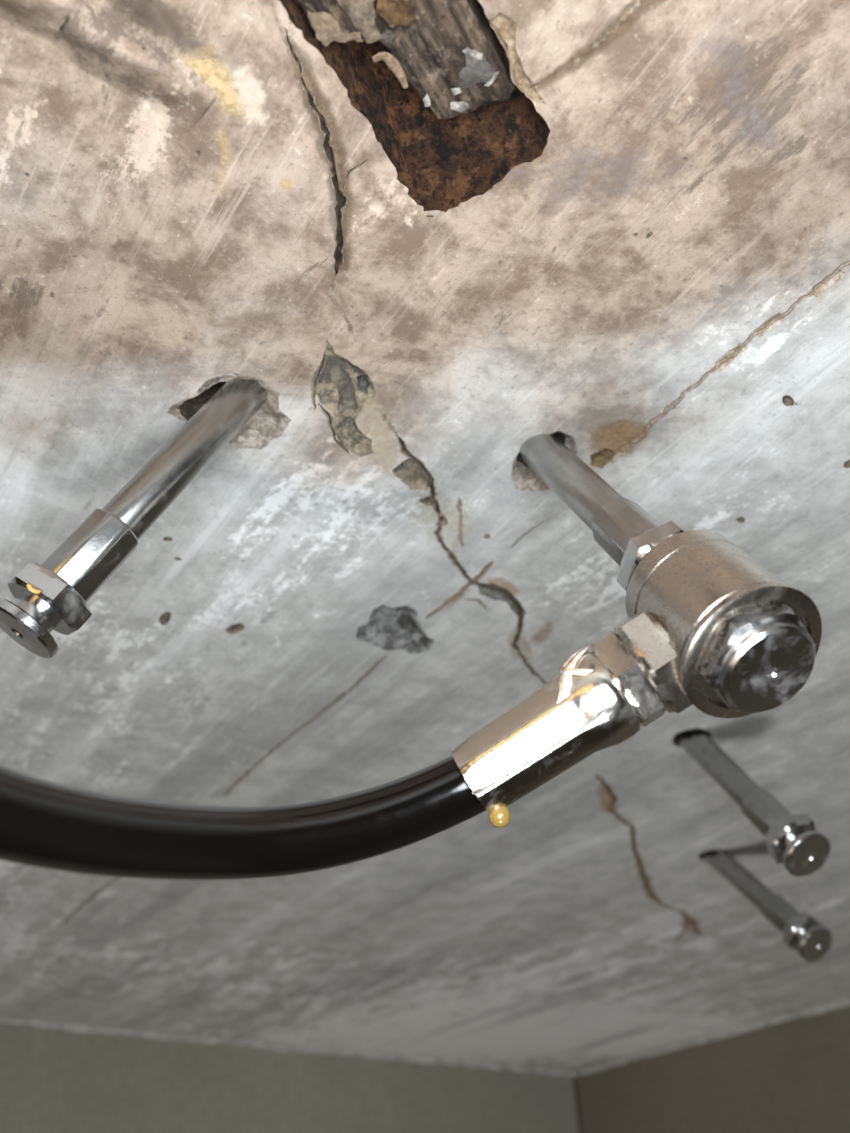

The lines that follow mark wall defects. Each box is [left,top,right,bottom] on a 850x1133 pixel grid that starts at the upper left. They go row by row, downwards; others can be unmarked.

water stain [115,0,268,129]
water stain [292,47,350,270]
crack [284,27,368,337]
spalling [279,0,550,212]
crack [529,0,643,88]
water stain [538,0,657,87]
spalling [166,373,291,450]
spalling [311,337,378,457]
crack [611,261,850,462]
crack [380,409,552,684]
spalling [356,605,434,655]
crack [595,775,702,941]